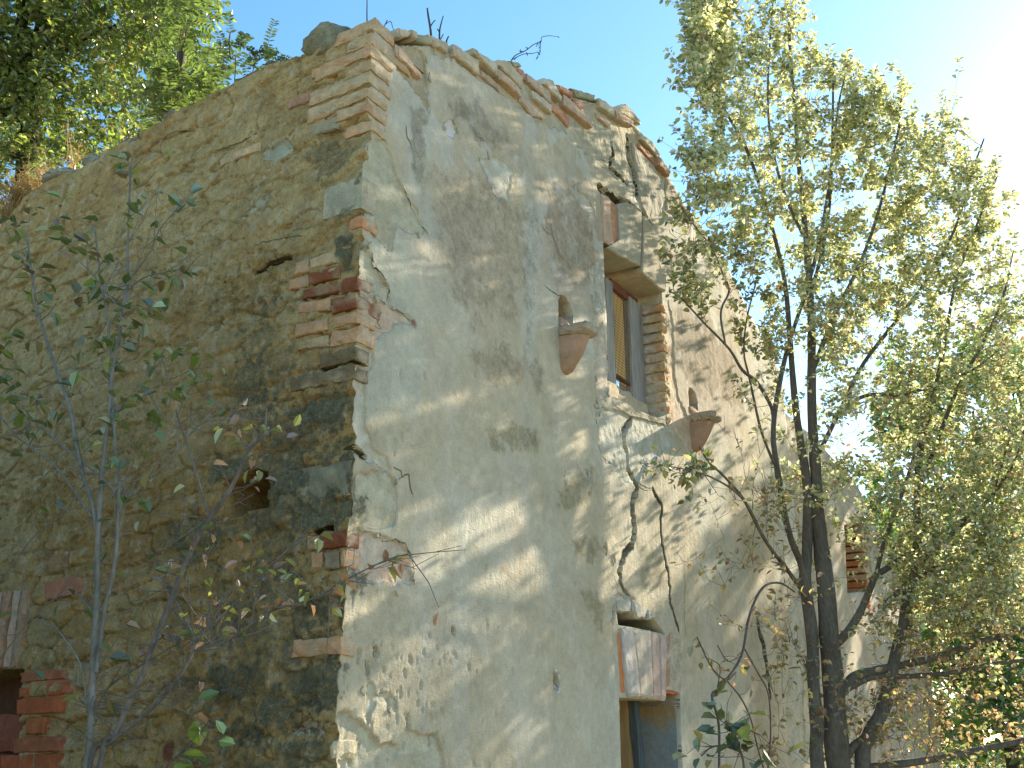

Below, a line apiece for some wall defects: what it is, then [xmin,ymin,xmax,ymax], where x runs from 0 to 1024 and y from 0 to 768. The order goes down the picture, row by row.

crack [597,135,654,226]
spalling [343,139,424,596]
crack [596,418,686,632]